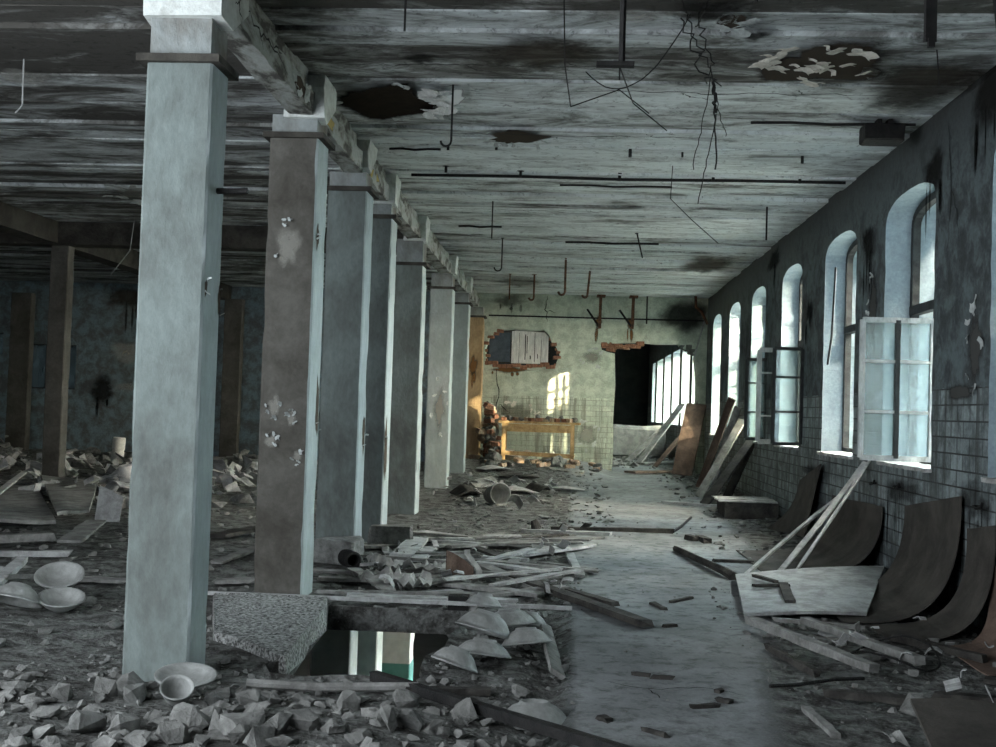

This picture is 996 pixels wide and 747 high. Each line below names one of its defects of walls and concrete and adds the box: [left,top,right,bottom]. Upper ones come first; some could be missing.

peeling [748,45,880,87]
peeling [391,82,465,120]
spalling [484,329,561,370]